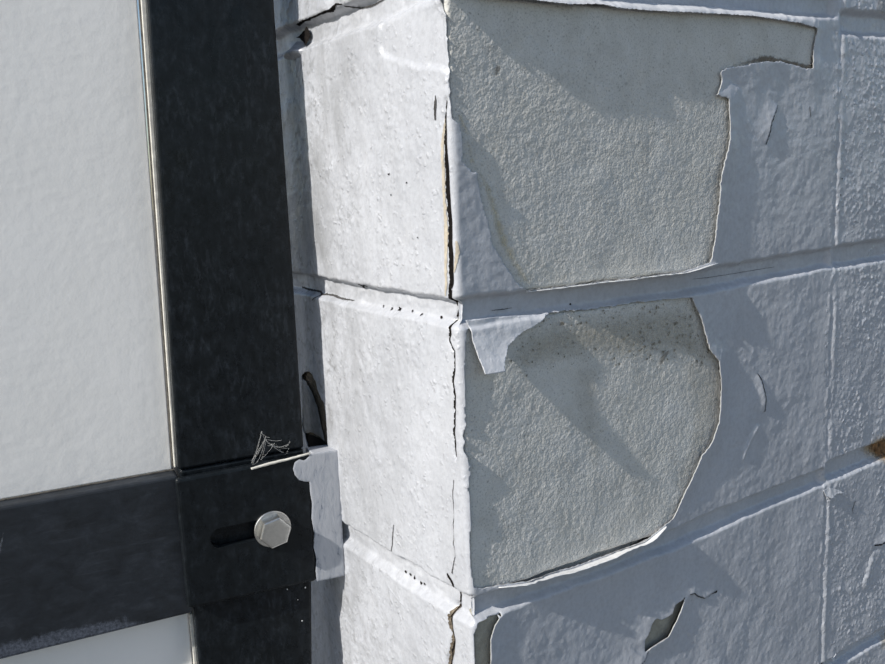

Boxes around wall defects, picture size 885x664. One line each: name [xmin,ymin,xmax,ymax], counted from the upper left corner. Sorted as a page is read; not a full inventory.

crack [296,0,383,26]
peeling [441,0,819,292]
crack [434,96,460,457]
spalling [302,372,327,447]
peeling [458,298,720,588]
corrosion [865,439,885,458]
crack [447,480,462,664]
peeling [469,609,501,664]
peeling [645,591,717,651]